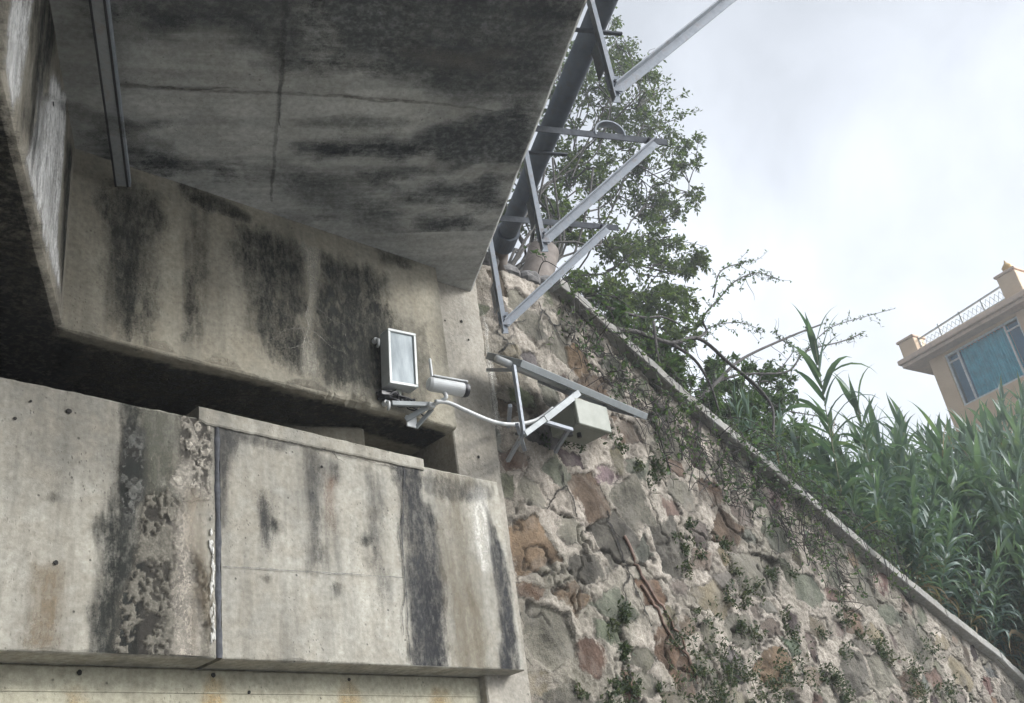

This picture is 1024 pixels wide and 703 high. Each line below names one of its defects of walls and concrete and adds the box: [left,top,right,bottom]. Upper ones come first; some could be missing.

leakage [124,0,580,169]
leakage [0,0,447,666]
spalling [113,415,216,657]
leakage [470,489,516,669]